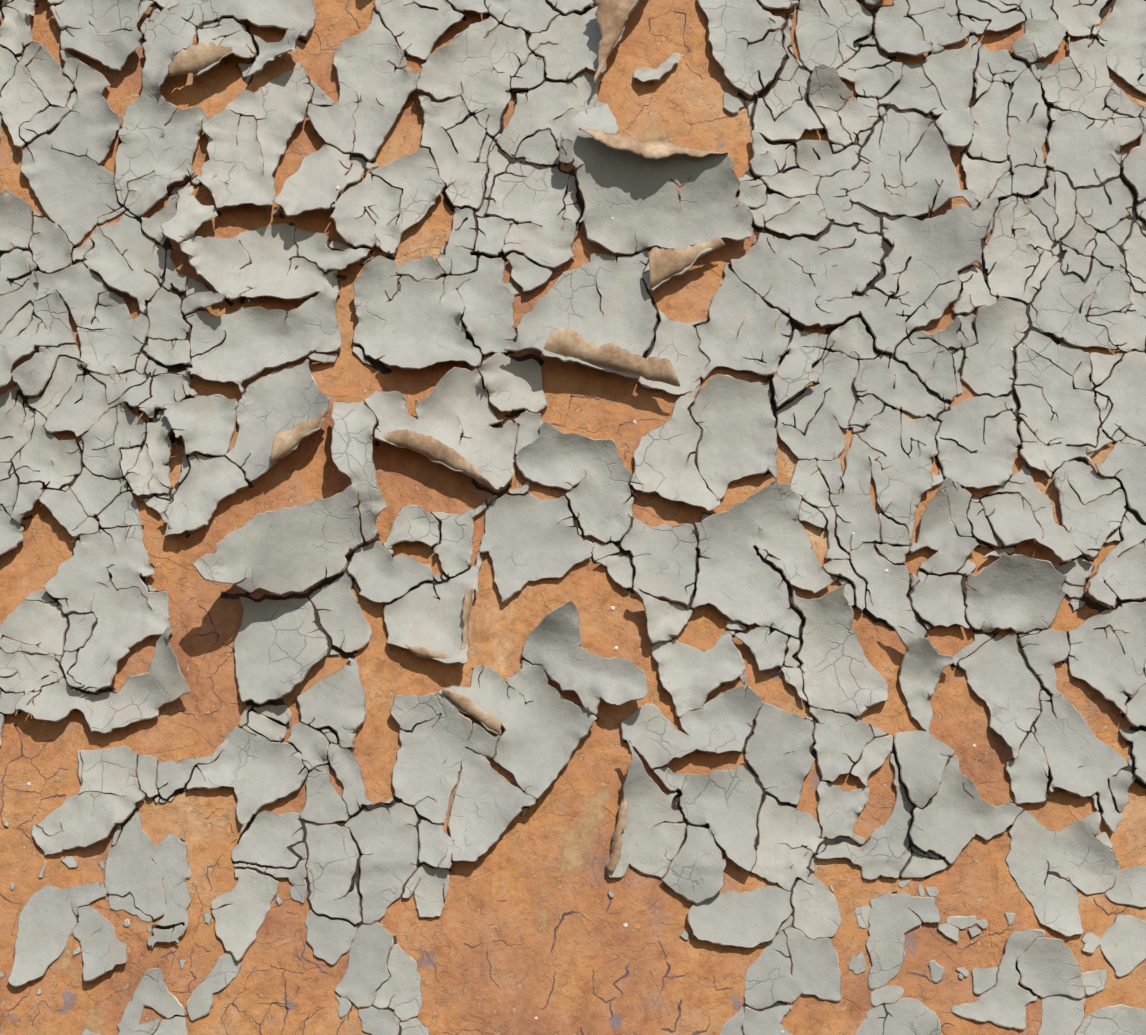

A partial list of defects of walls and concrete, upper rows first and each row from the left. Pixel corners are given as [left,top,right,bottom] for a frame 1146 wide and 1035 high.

crack [0,0,259,555]
crack [272,0,602,389]
peeling [192,401,387,594]
crack [103,512,483,774]
peeling [383,502,546,682]
peeling [621,674,763,769]
crack [727,547,950,925]
crack [687,0,1146,837]
peeling [1086,511,1146,609]
peeling [7,881,107,987]
crack [107,795,443,1035]
peeling [574,807,770,1035]